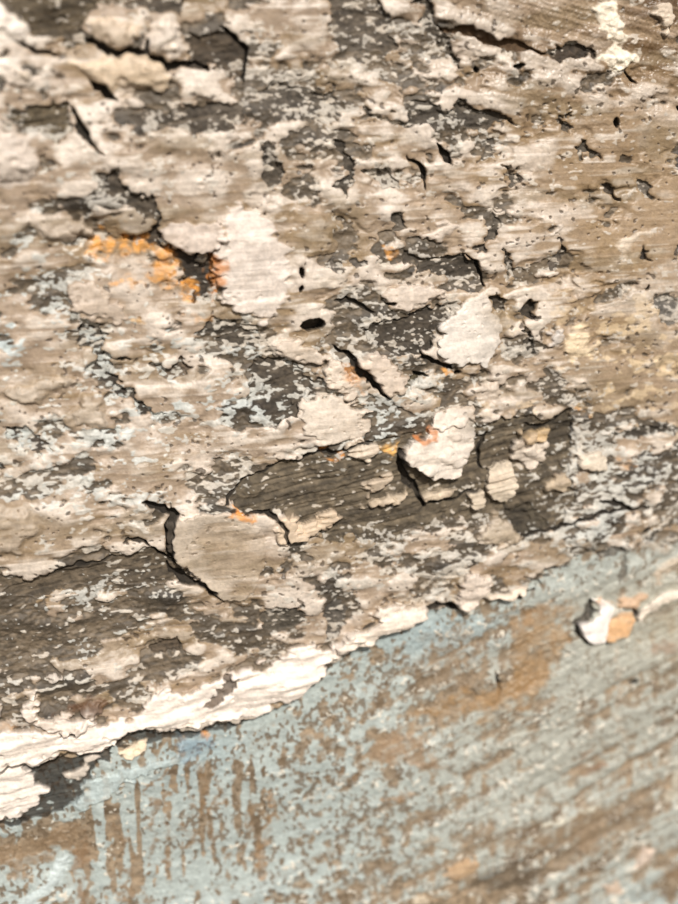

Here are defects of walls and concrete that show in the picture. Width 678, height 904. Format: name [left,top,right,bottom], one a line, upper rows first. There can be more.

spalling [5,0,184,50]
crack [84,36,210,72]
crack [220,26,249,85]
spalling [328,0,399,56]
spalling [546,41,596,64]
spalling [129,101,244,139]
spalling [363,98,516,161]
corrosion [83,224,232,333]
spalling [0,165,607,601]
crack [225,440,374,546]
crack [396,431,488,507]
spalling [0,719,250,822]